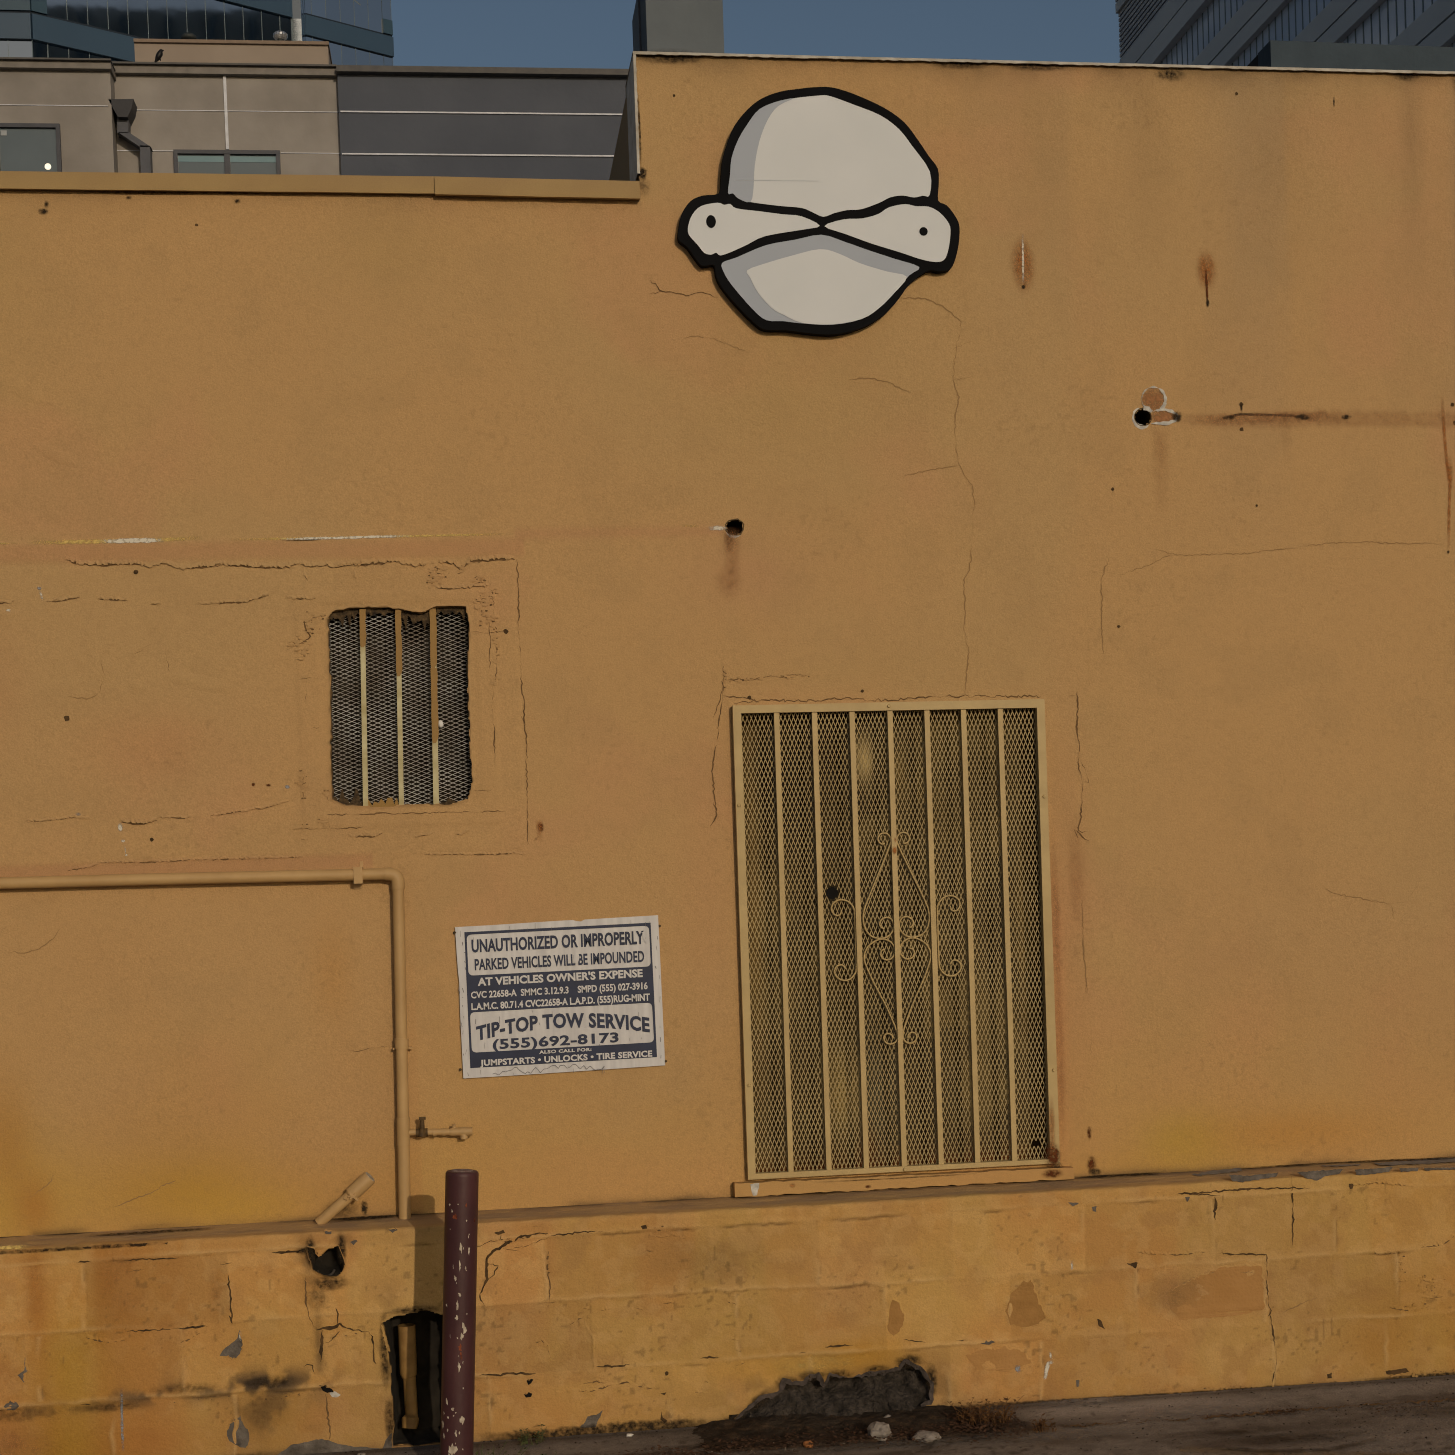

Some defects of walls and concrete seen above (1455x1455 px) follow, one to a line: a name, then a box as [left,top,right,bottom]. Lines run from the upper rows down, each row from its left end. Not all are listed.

corrosion [1016,243,1030,288]
corrosion [1201,259,1213,306]
corrosion [1442,418,1452,529]
peeling [66,553,515,590]
crack [710,297,1089,841]
peeling [1297,1158,1455,1189]
crack [477,1231,602,1304]
peeling [1005,1278,1047,1327]
spalling [278,1203,475,1455]
crack [482,1370,536,1378]
crack [597,1362,629,1370]
spalling [730,1359,934,1419]